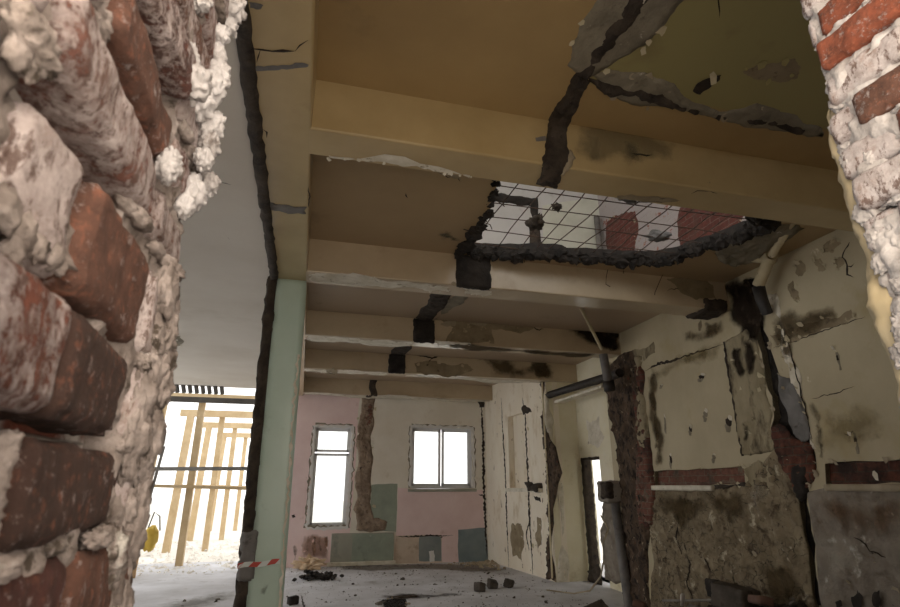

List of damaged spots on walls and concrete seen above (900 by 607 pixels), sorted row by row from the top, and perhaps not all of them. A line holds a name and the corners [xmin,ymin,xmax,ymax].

crack [254,40,308,61]
peeling [327,154,472,181]
spalling [454,180,805,300]
peeling [788,237,845,303]
damp [775,311,835,355]
peeling [305,368,387,376]
peeling [305,392,459,425]
flaking render [767,293,900,488]
spalling [303,423,357,531]
spalling [406,359,570,582]